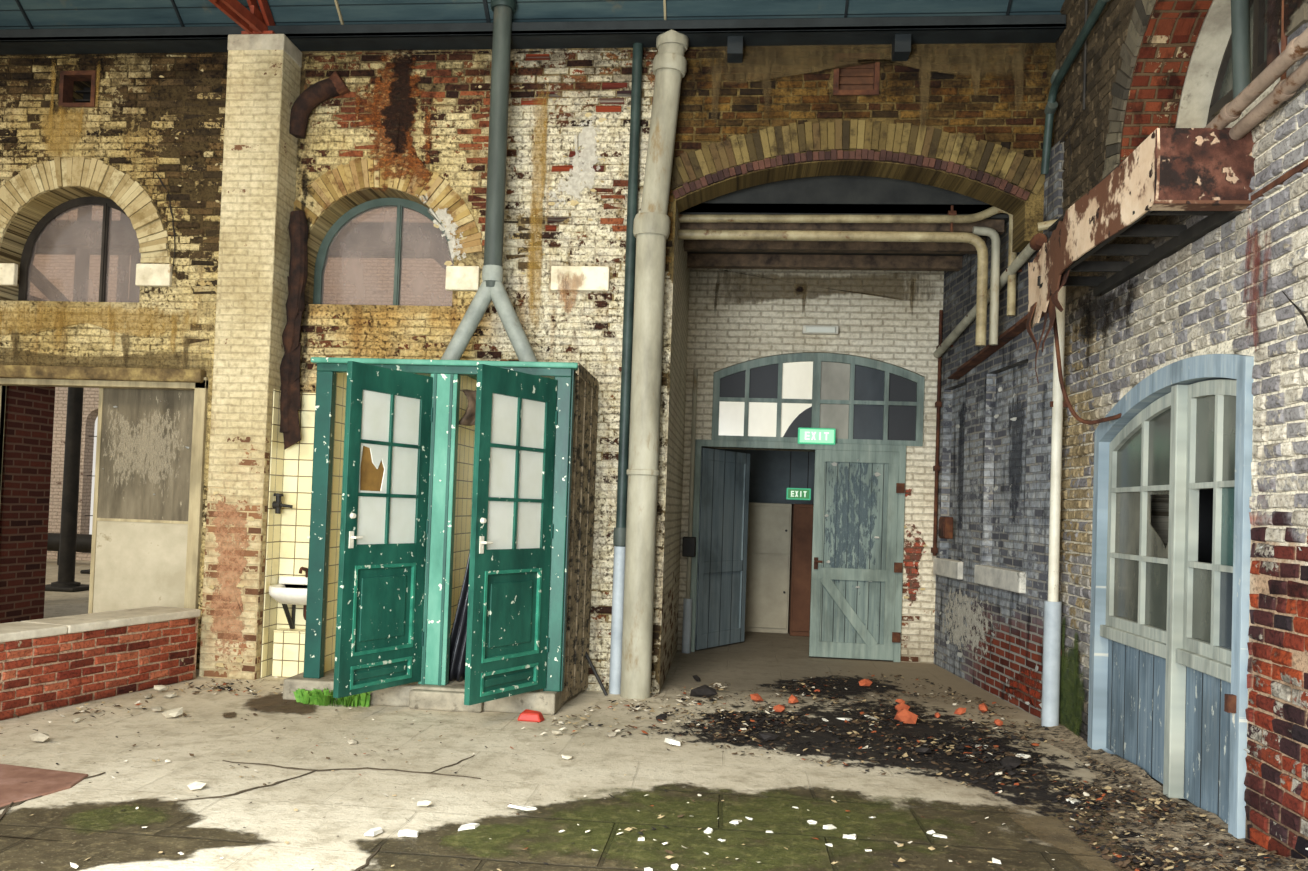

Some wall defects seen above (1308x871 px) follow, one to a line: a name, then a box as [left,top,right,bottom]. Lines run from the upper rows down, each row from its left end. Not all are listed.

spalling [332,92,383,157]
spalling [412,62,490,164]
peeling [417,181,487,266]
damp [1071,278,1138,367]
crack [1281,290,1308,327]
spalling [208,491,254,668]
crack [157,755,481,802]